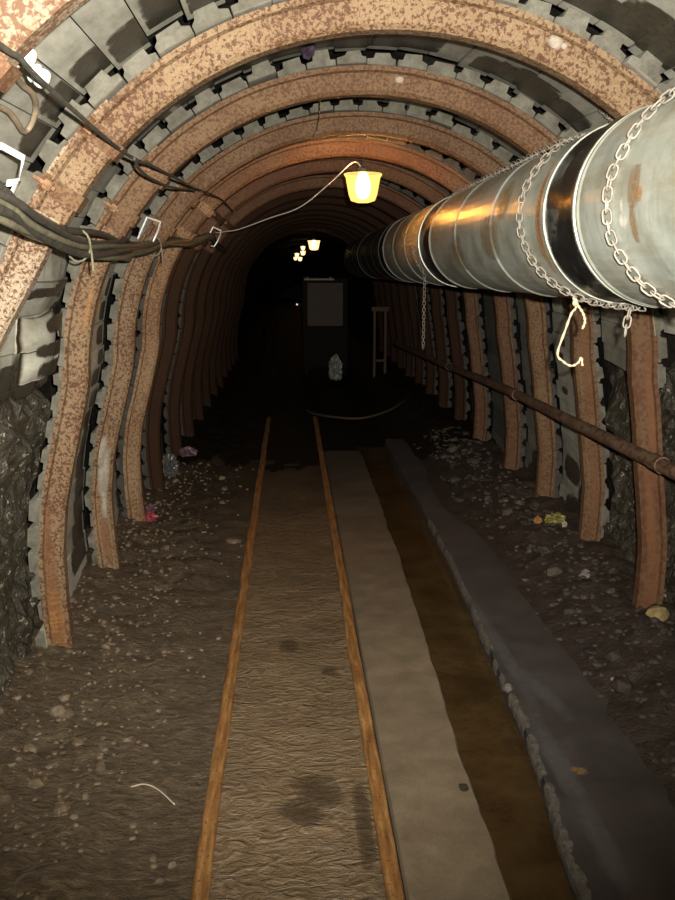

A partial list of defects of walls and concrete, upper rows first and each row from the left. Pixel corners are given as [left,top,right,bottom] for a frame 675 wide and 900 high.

corrosion [629,171,642,242]